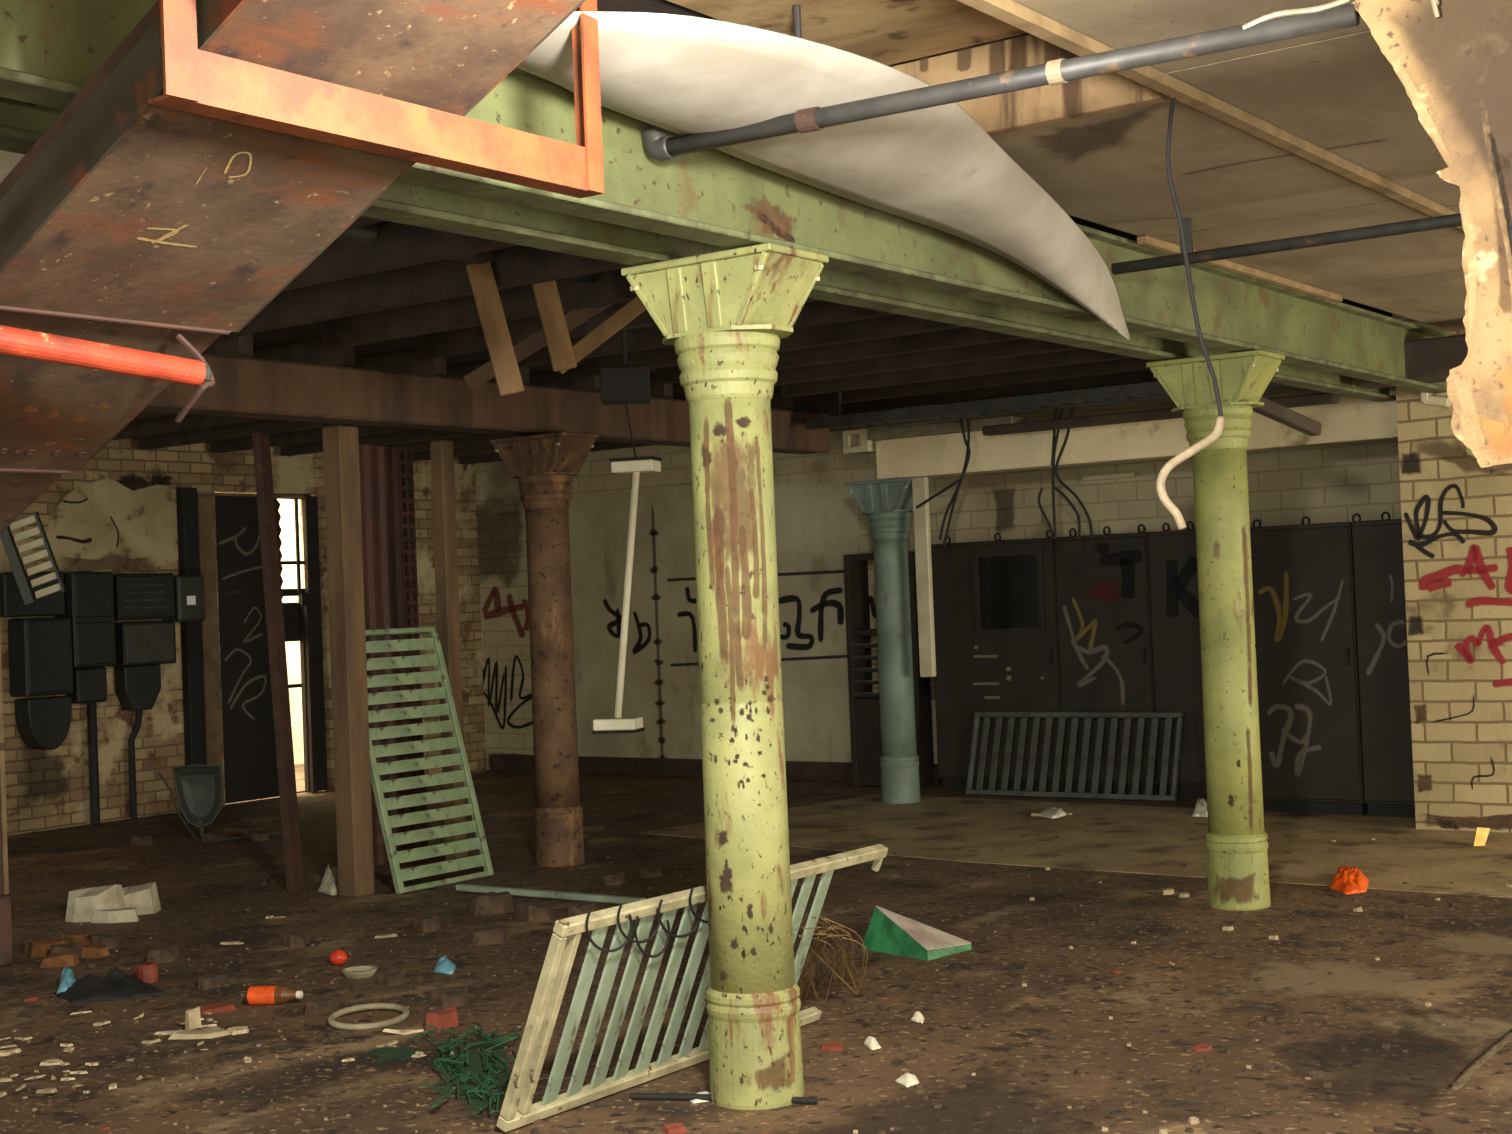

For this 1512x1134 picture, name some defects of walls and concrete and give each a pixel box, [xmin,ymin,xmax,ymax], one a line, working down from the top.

corrosion [747,198,796,243]
spalling [1402,453,1420,474]
flaking render [46,479,178,572]
corrosion [702,400,768,720]
corrosion [756,1056,789,1089]